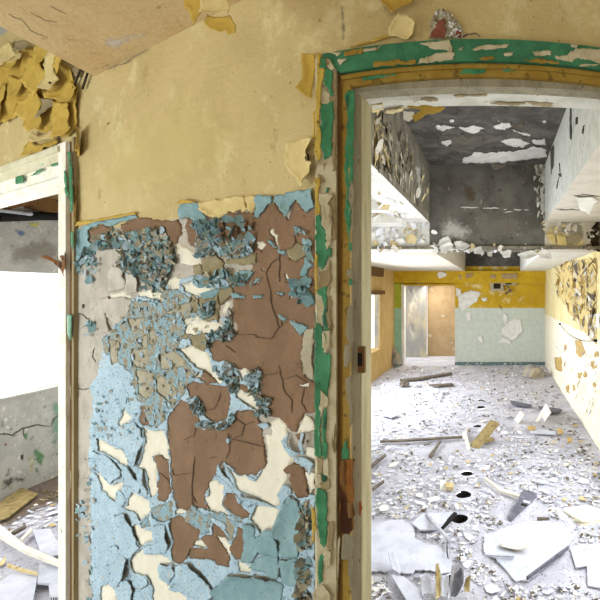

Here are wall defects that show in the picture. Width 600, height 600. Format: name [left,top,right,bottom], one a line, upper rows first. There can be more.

flaking render [362,9,464,81]
peeling [472,44,513,61]
peeling [524,44,600,64]
peeling [435,119,484,134]
peeling [371,97,446,208]
peeling [0,0,415,600]
crack [237,235,296,340]
peeling [371,122,600,416]
crack [263,367,307,413]
crack [0,415,58,437]
crack [211,420,266,458]
crack [159,457,197,504]